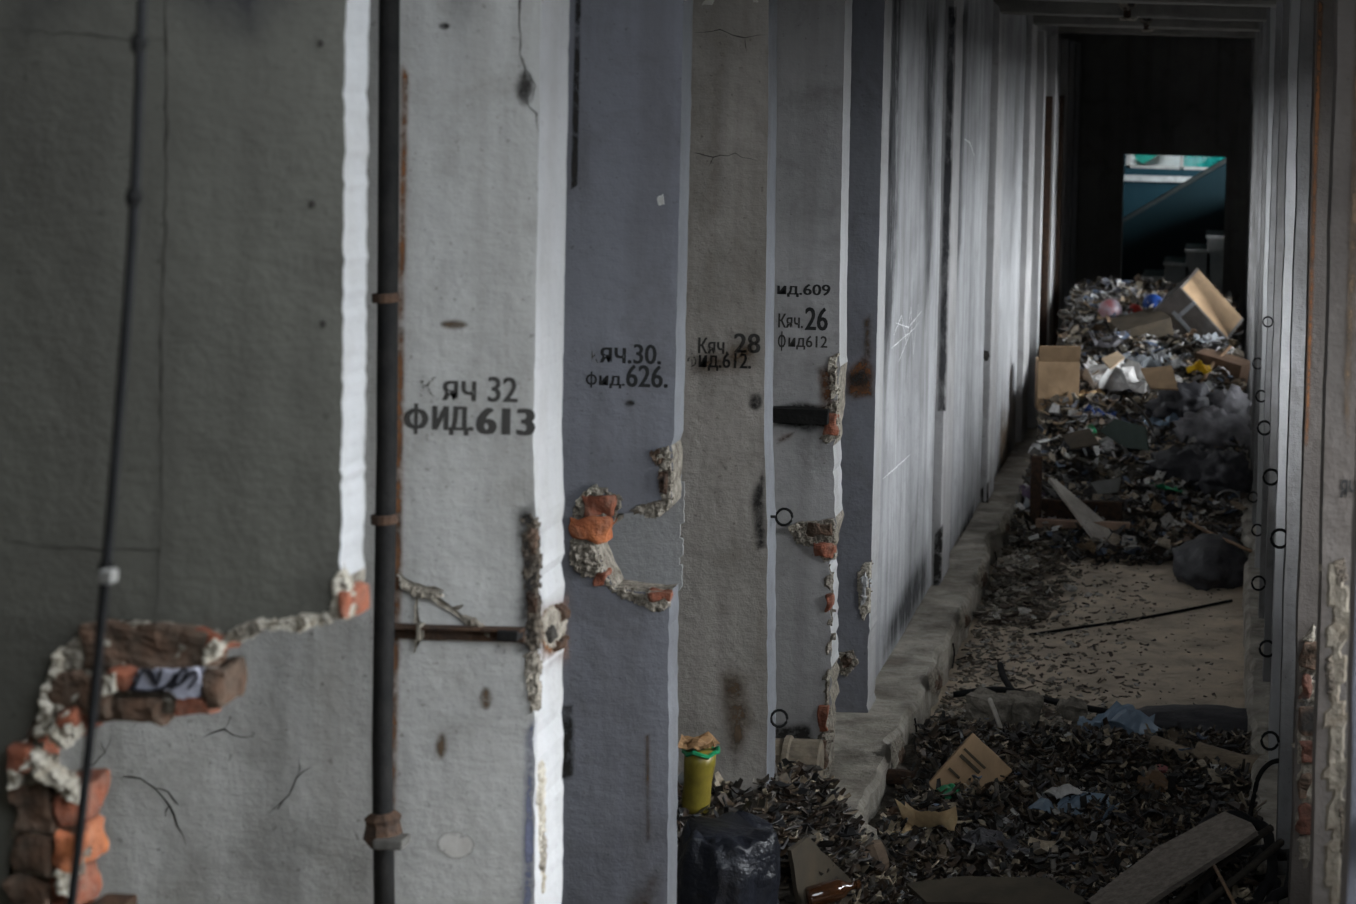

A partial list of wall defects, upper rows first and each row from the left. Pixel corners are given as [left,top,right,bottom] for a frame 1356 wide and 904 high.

flaking render [819,353,841,444]
flaking render [1,563,370,904]
flaking render [519,510,571,713]
flaking render [568,445,675,612]
flaking render [788,518,859,778]
flaking render [857,560,874,621]
flaking render [1291,558,1350,904]